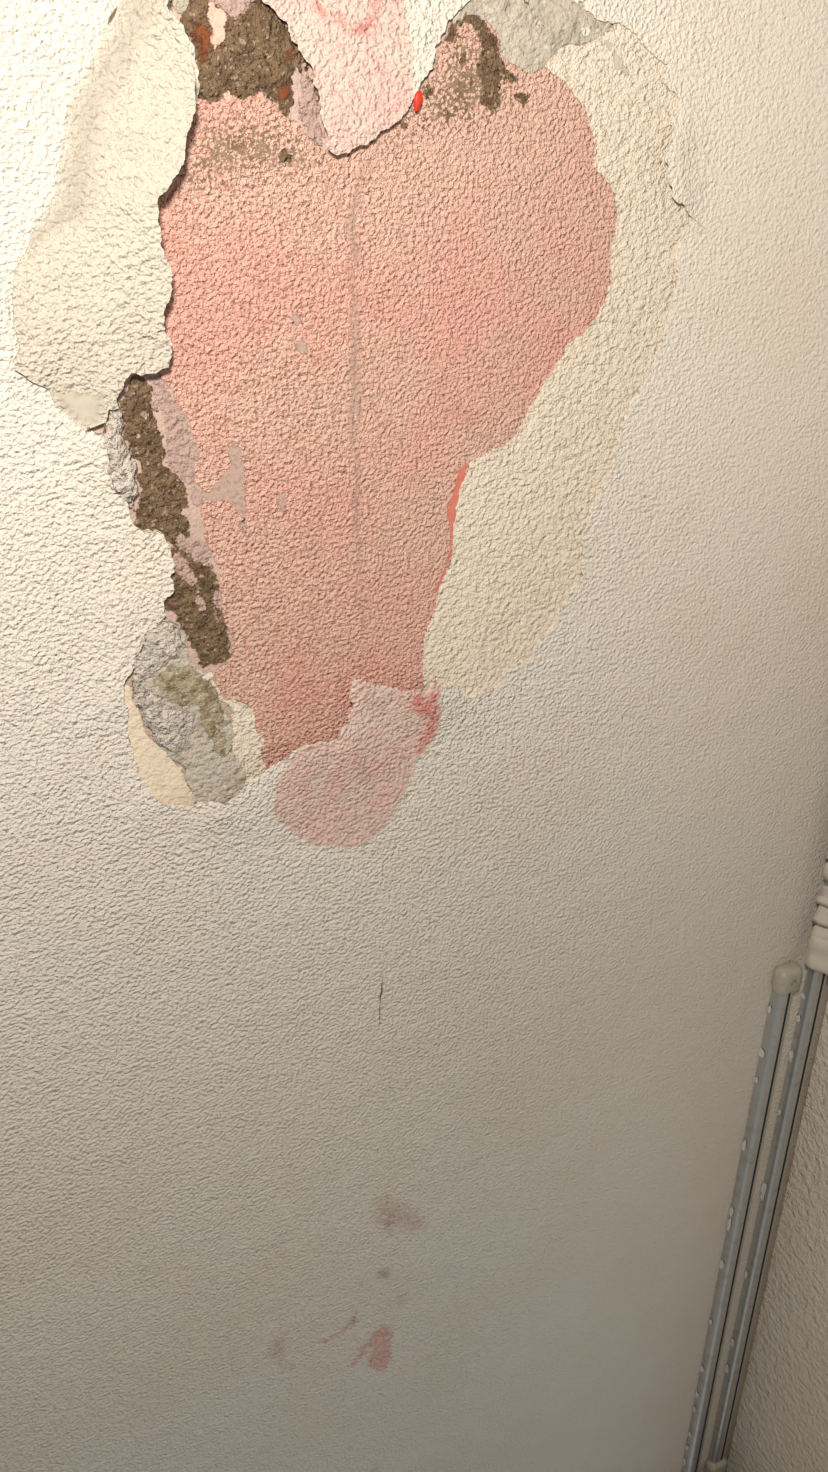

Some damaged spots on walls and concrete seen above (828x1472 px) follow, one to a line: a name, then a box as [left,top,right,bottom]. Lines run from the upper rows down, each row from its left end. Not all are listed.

spalling [90,0,691,869]